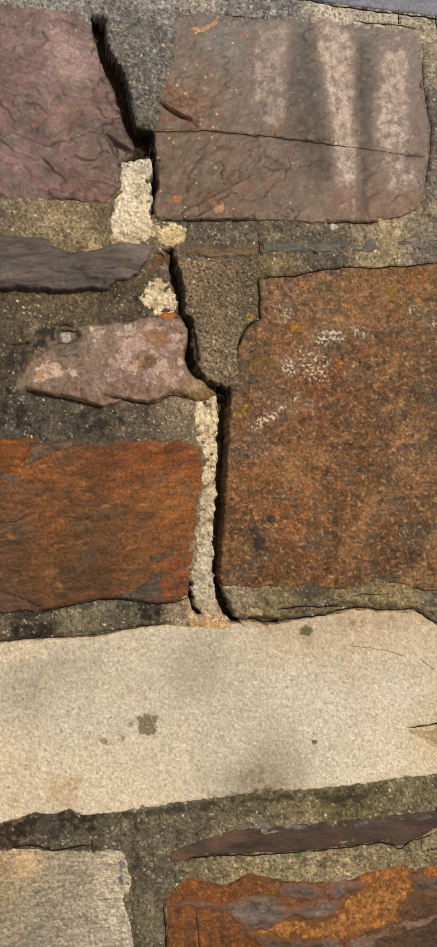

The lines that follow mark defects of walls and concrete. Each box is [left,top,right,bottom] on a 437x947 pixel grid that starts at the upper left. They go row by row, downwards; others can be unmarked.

crack [91,18,432,255]
damp [248,21,291,128]
damp [314,20,365,219]
crack [298,0,437,29]
damp [373,33,427,193]
crack [0,250,437,641]
crack [7,843,90,851]
crack [188,834,437,861]